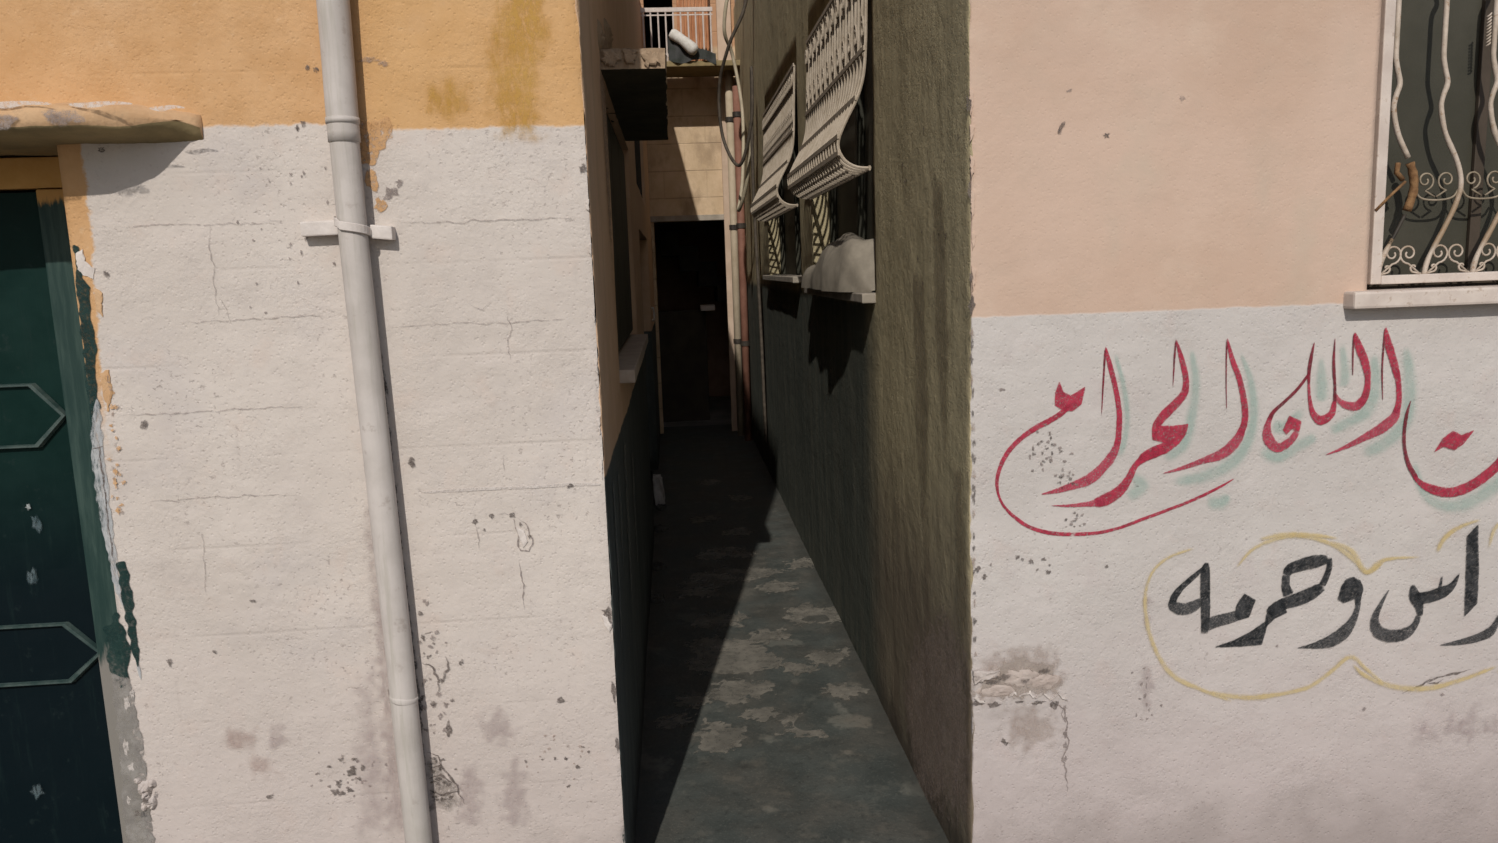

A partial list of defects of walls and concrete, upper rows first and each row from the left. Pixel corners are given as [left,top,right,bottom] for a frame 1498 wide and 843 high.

peeling [360,117,403,212]
peeling [76,249,108,317]
spalling [957,89,1068,708]
peeling [418,630,463,737]
peeling [310,752,387,797]
peeling [429,753,464,808]